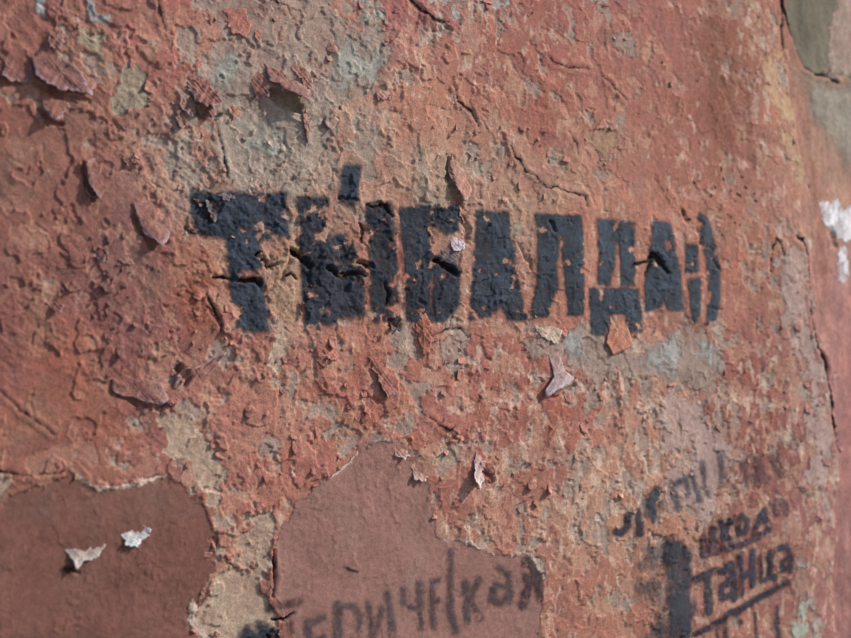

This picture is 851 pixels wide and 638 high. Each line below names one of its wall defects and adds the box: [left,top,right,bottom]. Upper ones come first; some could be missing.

peeling [0,28,99,121]
peeling [164,0,398,222]
crack [410,0,449,22]
spalling [760,0,851,188]
peeling [133,203,172,245]
peeling [64,544,106,569]
peeling [121,526,151,547]
peeling [104,222,235,511]
peeling [256,239,312,382]
peeling [468,450,502,490]
peeling [520,312,753,532]
crack [770,237,838,449]